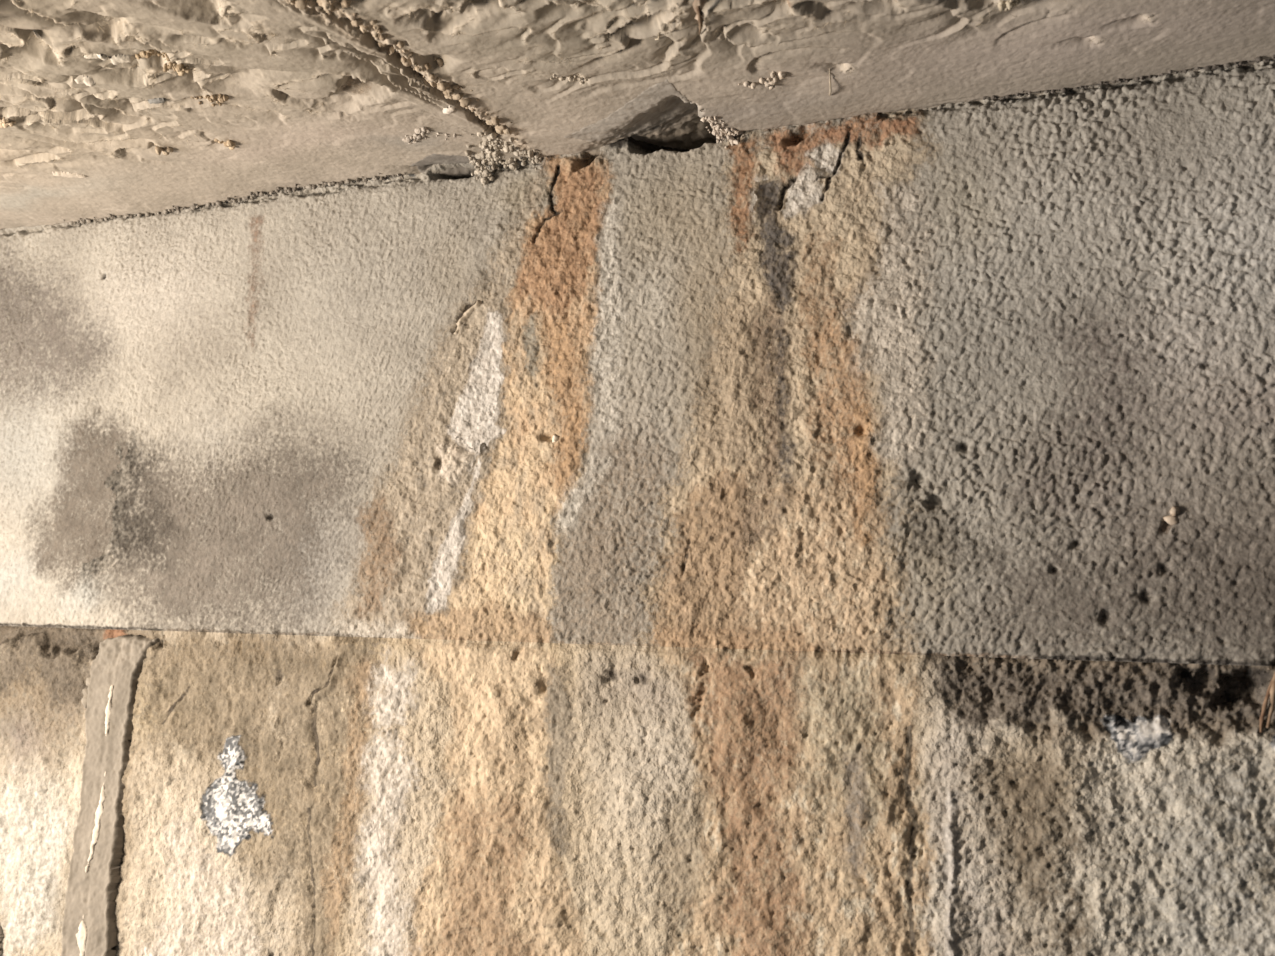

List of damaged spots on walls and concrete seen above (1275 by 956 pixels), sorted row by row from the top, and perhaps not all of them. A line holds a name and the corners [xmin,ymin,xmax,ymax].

crack [535,165,563,242]
corrosion [338,109,935,956]
corrosion [321,659,373,956]